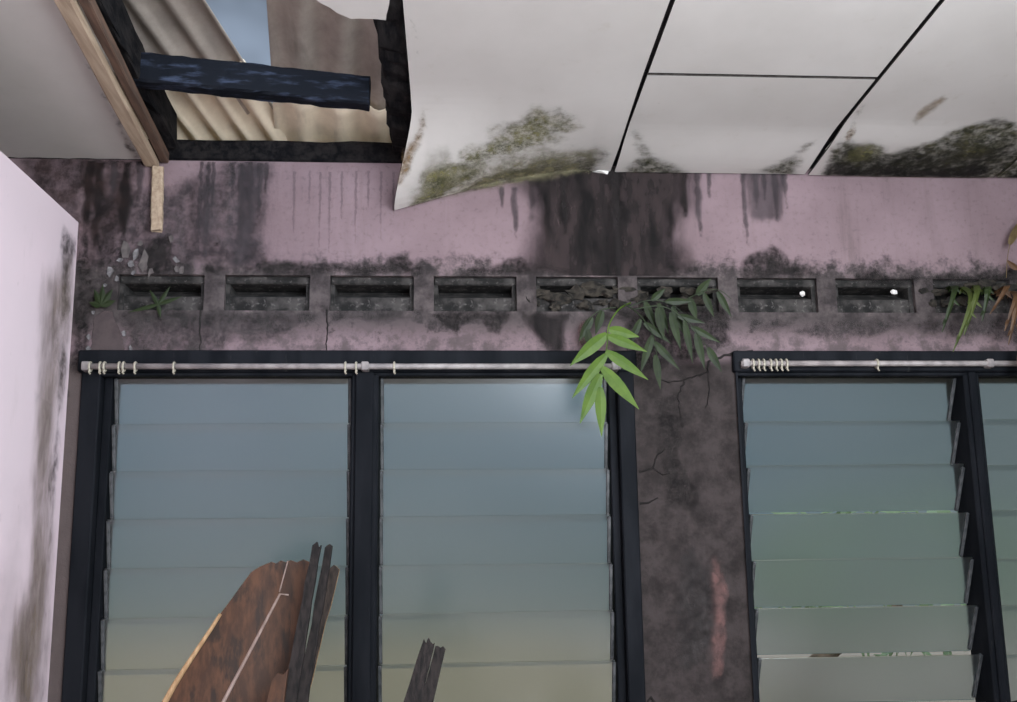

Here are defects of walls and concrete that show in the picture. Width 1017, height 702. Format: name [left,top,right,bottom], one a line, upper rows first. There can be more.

water stain [825,120,1017,178]
water stain [466,153,711,277]
water stain [741,160,795,227]
water stain [744,247,811,279]
water stain [33,159,420,480]
mould [437,310,509,332]
water stain [528,313,565,351]
water stain [605,308,728,368]
water stain [13,525,46,702]